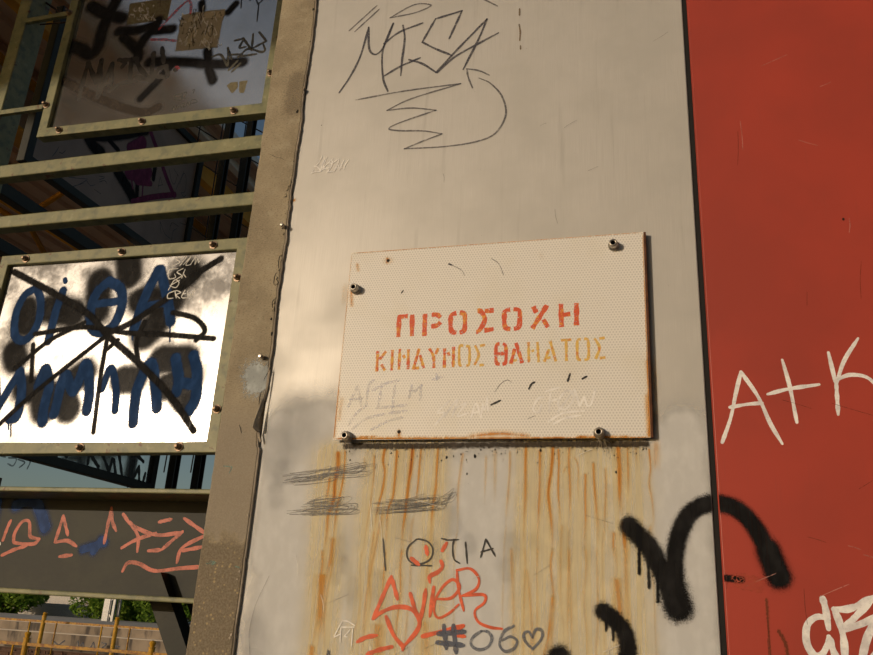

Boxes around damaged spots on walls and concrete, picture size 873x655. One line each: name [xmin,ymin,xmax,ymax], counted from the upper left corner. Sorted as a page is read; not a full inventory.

corrosion [327,451,346,528]
corrosion [334,285,650,527]